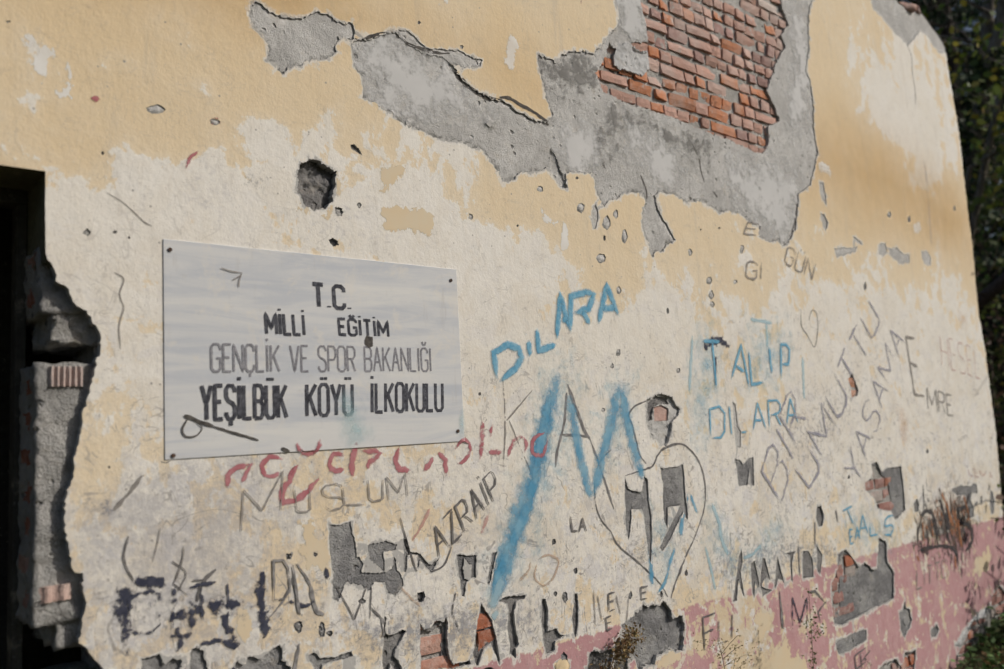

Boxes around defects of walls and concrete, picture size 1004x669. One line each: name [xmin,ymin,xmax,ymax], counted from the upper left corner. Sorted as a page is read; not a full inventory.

peeling [871,0,946,53]
crack [355,32,549,126]
peeling [249,0,832,257]
spalling [865,461,919,519]
spalling [831,538,912,637]
spalling [141,646,208,669]
spalling [235,645,291,669]
peeling [319,622,333,638]
flaking render [420,621,459,669]
flaking render [476,613,495,651]
spalling [588,591,710,669]
flaking render [880,649,916,669]